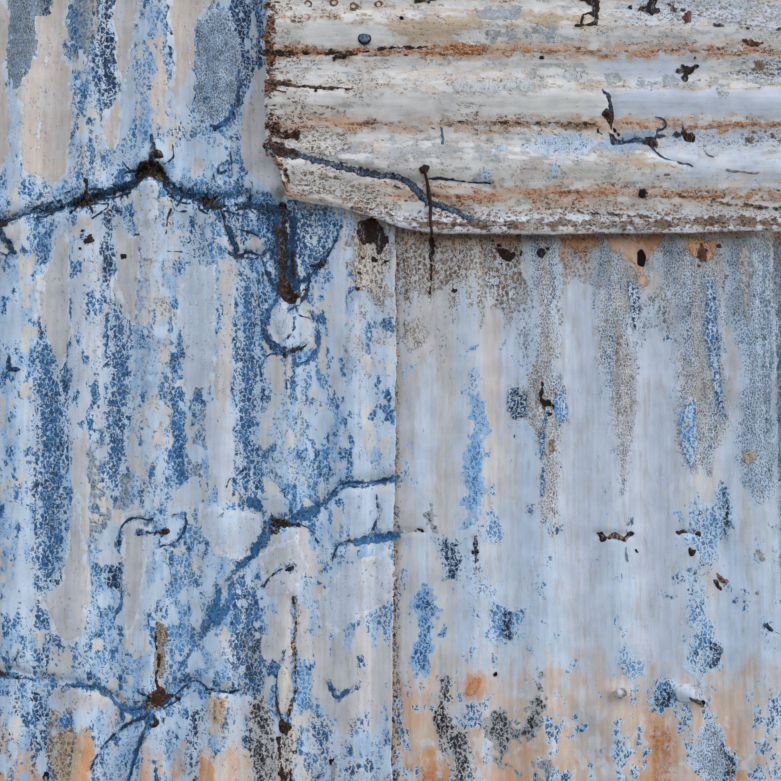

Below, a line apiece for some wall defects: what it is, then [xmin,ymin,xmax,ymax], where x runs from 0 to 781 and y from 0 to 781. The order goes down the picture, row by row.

peeling [166,0,287,205]
rust [261,0,602,98]
rust [628,0,692,24]
rust [666,51,699,82]
rust [264,117,781,312]
peeling [29,225,92,647]
peeling [198,273,312,603]
peeling [504,234,572,538]
peeling [588,231,781,716]
peeling [408,391,548,781]
crack [204,683,244,699]
rust [274,719,297,781]